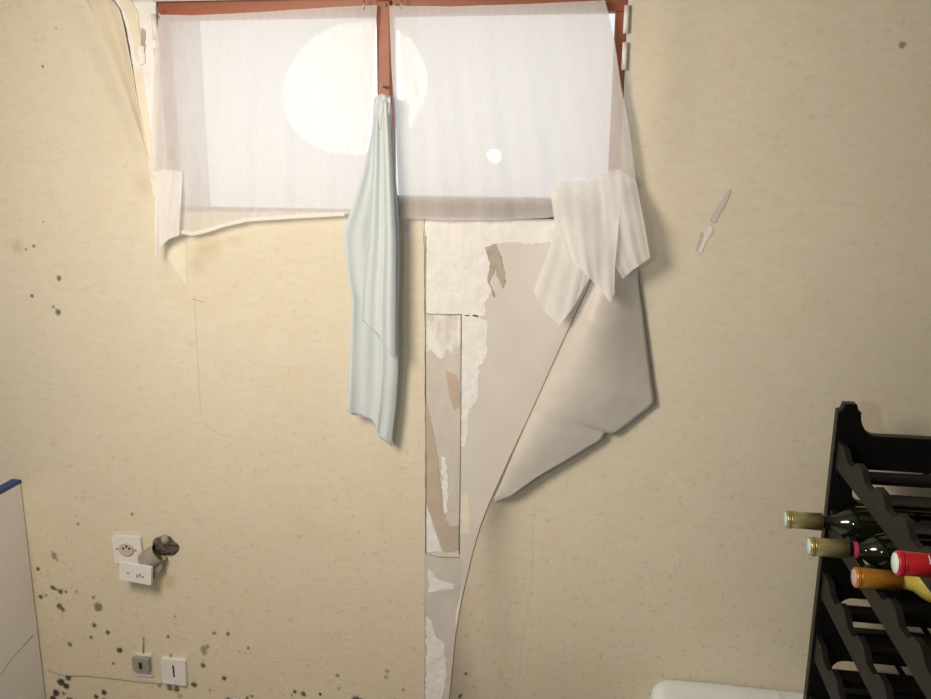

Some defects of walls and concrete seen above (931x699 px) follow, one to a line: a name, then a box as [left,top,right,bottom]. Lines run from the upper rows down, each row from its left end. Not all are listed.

spalling [115,0,157,127]
flaking render [425,232,591,597]
water stain [50,676,73,699]